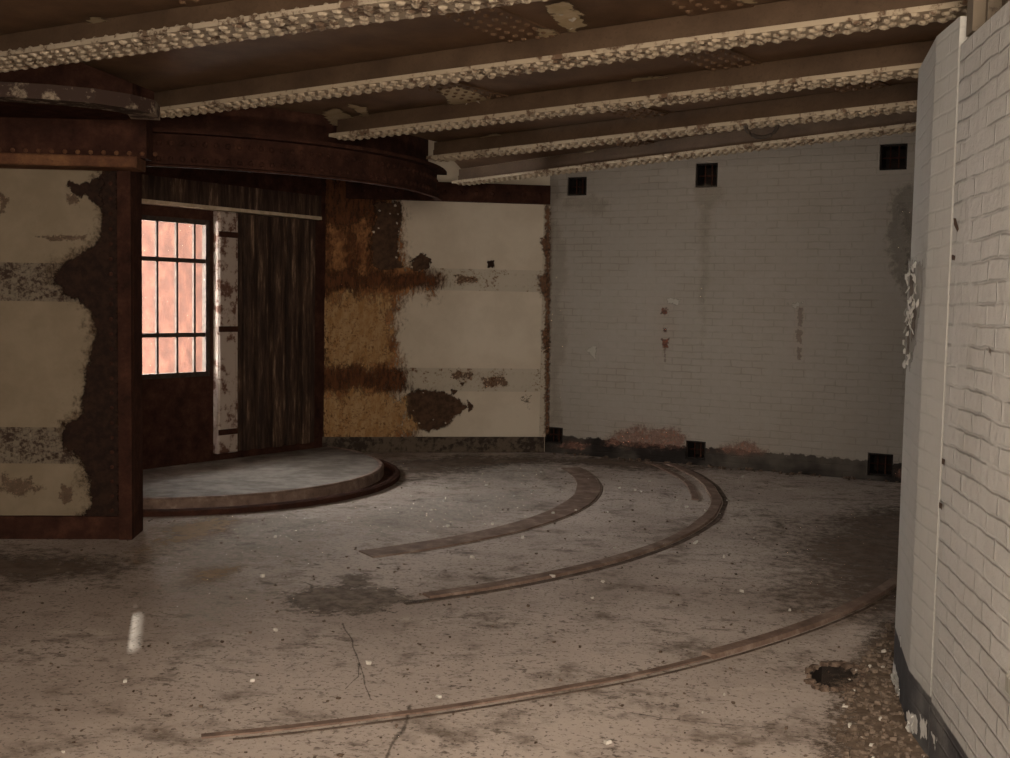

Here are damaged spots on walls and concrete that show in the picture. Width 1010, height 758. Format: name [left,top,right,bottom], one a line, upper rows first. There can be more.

peeling [533,2,587,38]
peeling [370,201,432,271]
peeling [902,259,923,371]
peeling [403,382,473,432]
peeling [891,660,900,697]
crack [386,705,411,758]
peeling [905,710,937,744]